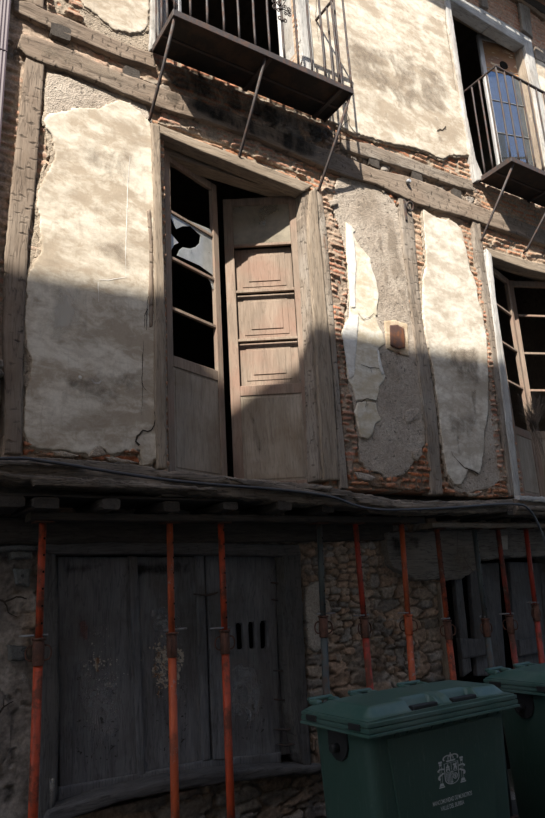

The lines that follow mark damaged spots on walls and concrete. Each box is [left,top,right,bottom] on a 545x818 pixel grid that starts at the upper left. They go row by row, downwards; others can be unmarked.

spalling [45,0,84,23]
damp [169,67,290,134]
spalling [158,113,310,182]
damp [283,123,333,153]
flaking render [320,175,431,492]
crack [135,296,155,446]
spalling [442,280,513,498]
spalling [23,441,139,465]